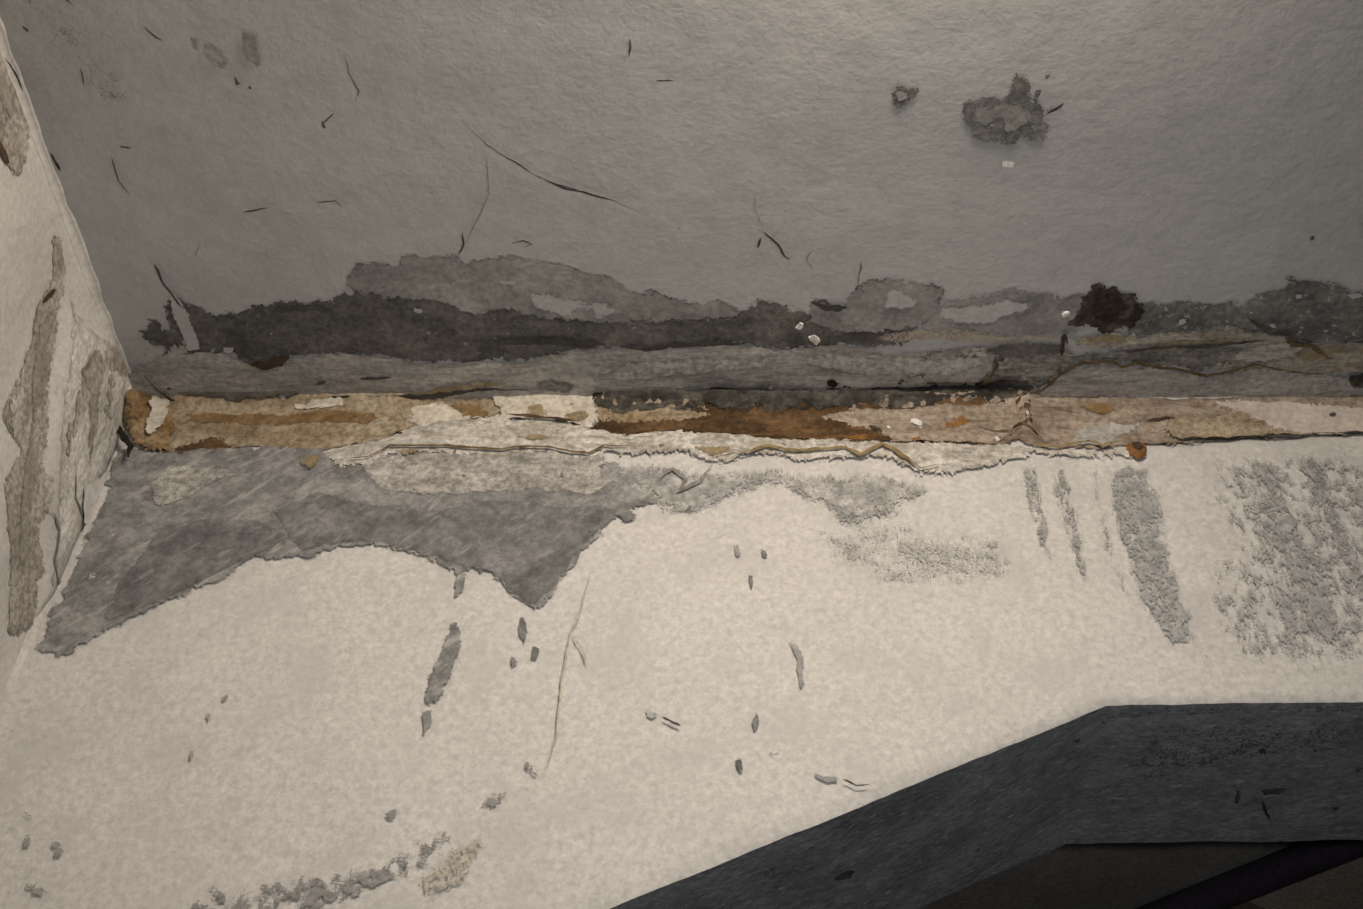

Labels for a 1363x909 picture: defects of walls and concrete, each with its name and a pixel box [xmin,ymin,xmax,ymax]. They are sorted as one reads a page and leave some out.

spalling [242,32,261,67]
spalling [891,86,920,109]
spalling [962,73,1064,167]
peeling [3,235,1363,666]
corrosion [590,388,1042,446]
corrosion [1126,441,1147,461]
crack [1167,431,1363,444]
damp [1022,463,1087,588]
damp [1093,443,1363,785]
peeling [422,622,462,734]
spalling [789,642,804,687]
spalling [645,710,681,726]